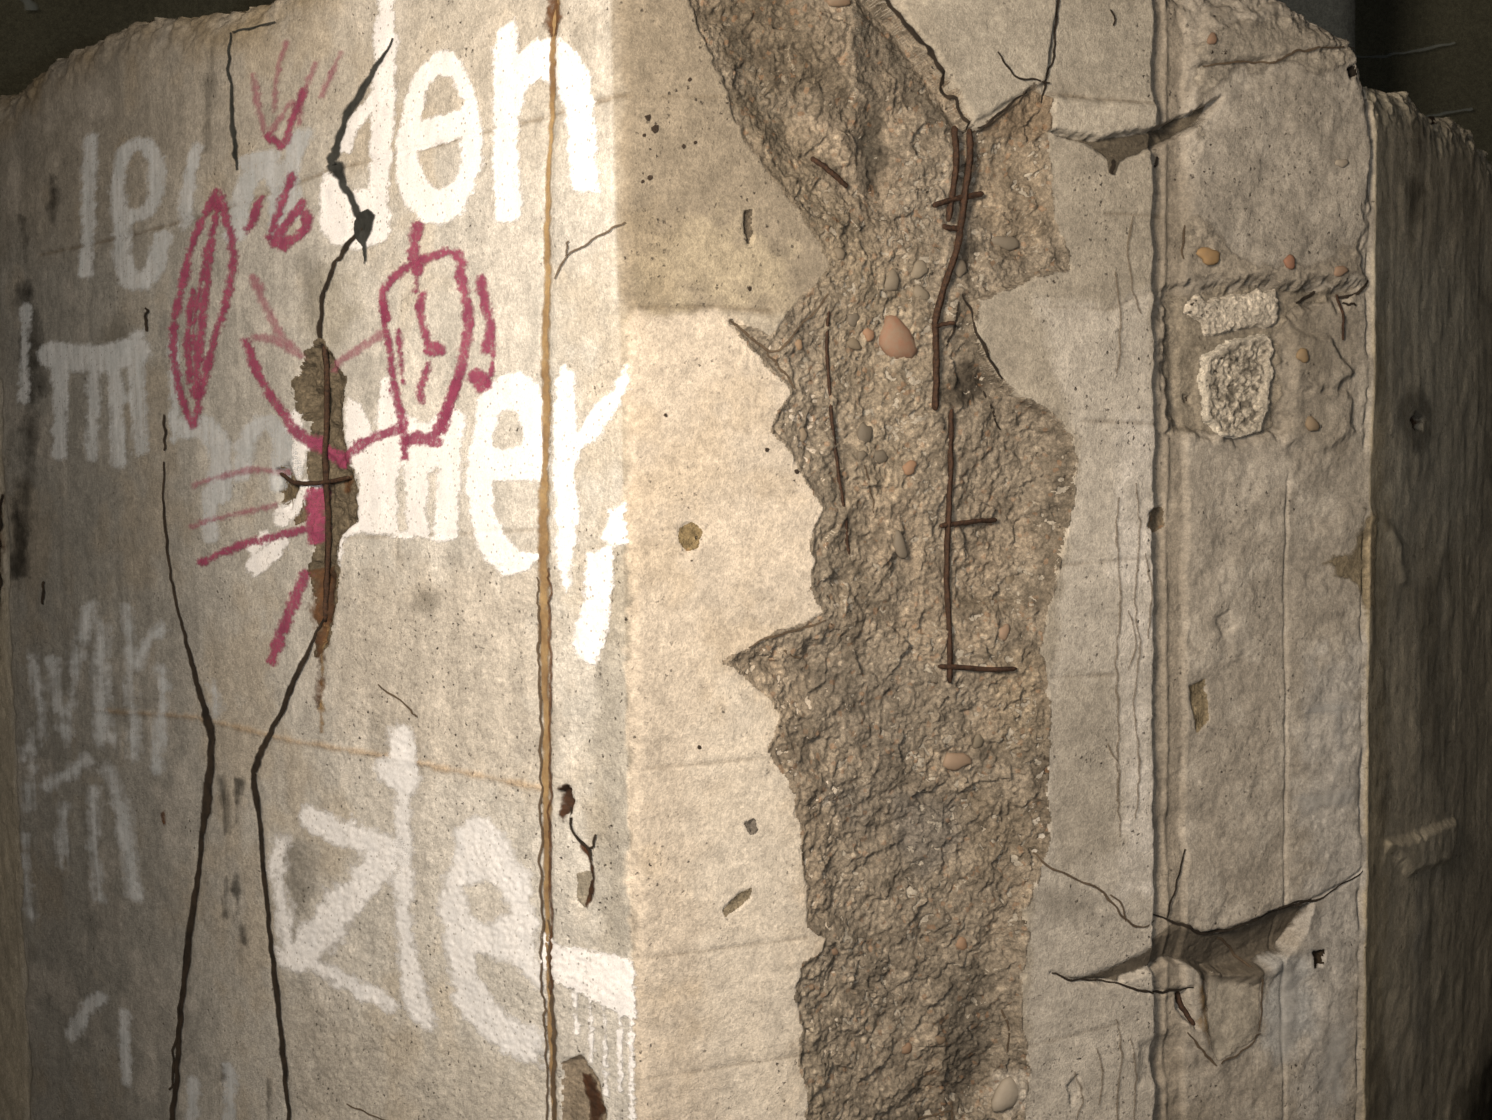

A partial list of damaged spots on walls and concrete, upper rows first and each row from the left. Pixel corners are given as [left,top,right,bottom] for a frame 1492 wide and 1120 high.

crack [142,307,150,331]
crack [226,21,275,170]
crack [316,38,393,347]
crack [162,414,215,1120]
crack [251,619,324,1120]
spalling [276,338,359,658]
crack [378,684,417,717]
corrosion [536,0,575,1120]
spalling [576,871,592,908]
spalling [690,0,1363,1120]
crack [347,1104,385,1120]
spalling [561,1055,607,1120]